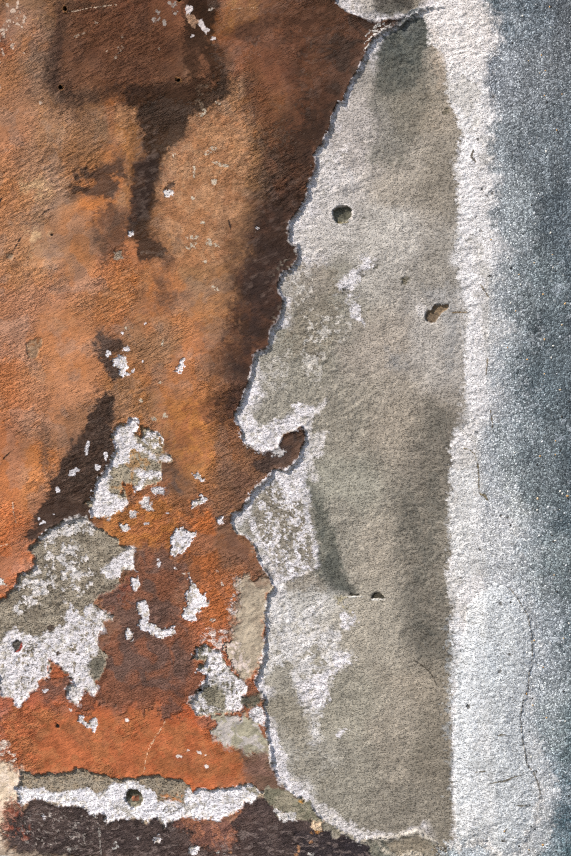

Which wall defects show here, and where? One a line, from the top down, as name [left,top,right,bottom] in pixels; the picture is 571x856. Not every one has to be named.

peeling [151,0,217,41]
peeling [334,0,397,24]
peeling [402,0,437,18]
leakage [20,0,247,319]
leakage [8,321,134,551]
corrosion [148,384,219,479]
peeling [12,23,471,856]
leakage [185,0,564,845]
corrosion [99,495,191,546]
leakage [37,539,253,722]
corrosion [196,571,238,638]
corrosion [0,698,242,790]